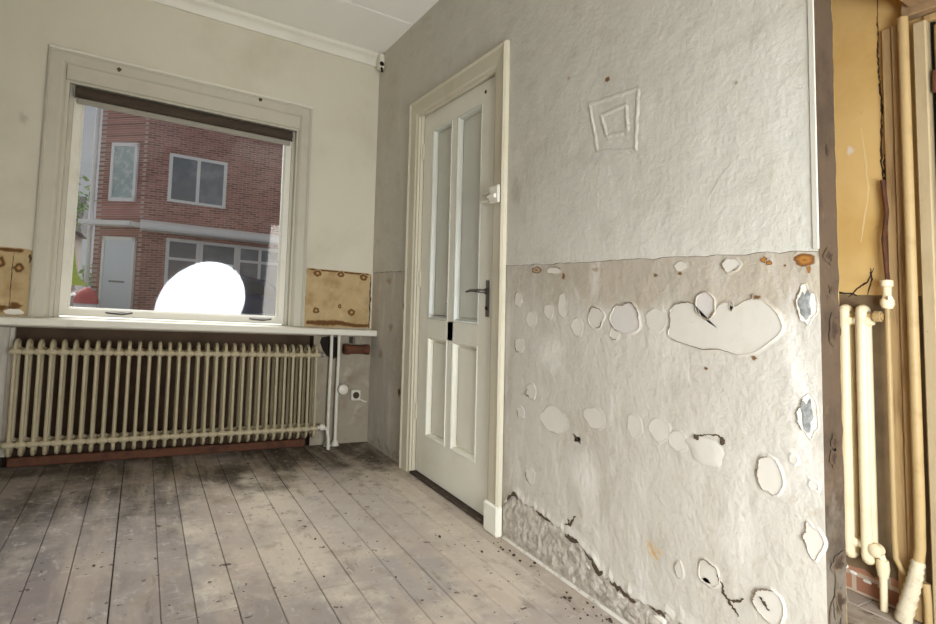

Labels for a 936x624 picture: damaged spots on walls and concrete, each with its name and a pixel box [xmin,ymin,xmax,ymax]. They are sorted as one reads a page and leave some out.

crack [876,0,886,183]
rust [790,251,819,273]
flaking render [795,282,819,326]
flaking render [796,393,820,440]
flaking render [502,483,701,624]